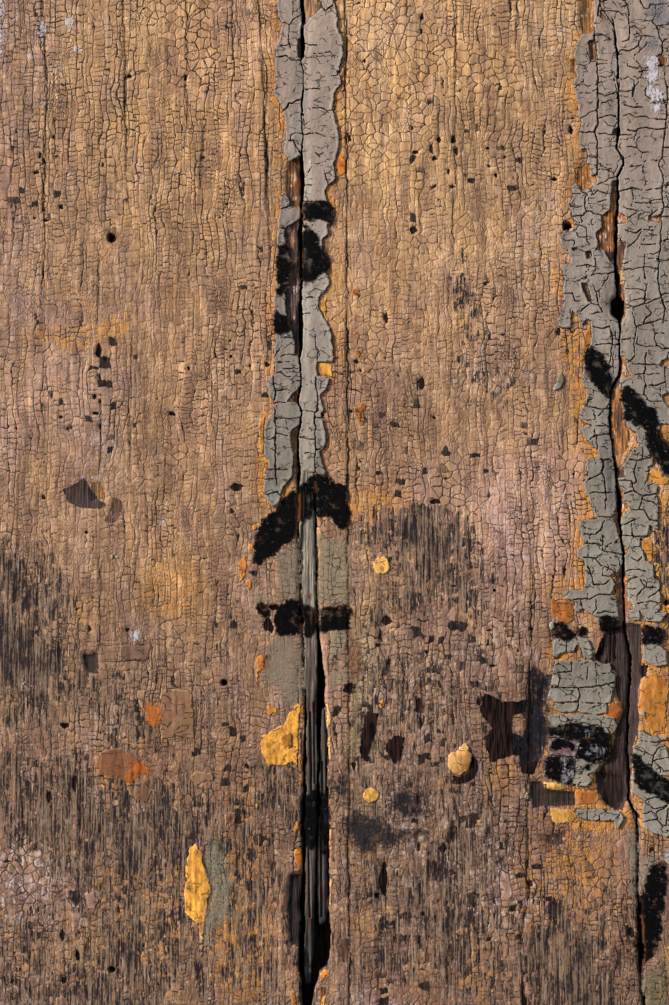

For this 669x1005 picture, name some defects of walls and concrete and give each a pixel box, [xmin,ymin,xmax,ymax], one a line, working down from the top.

peeling [258,0,351,506]
peeling [477,0,669,894]
peeling [312,963,329,1005]
peeling [452,756,478,783]